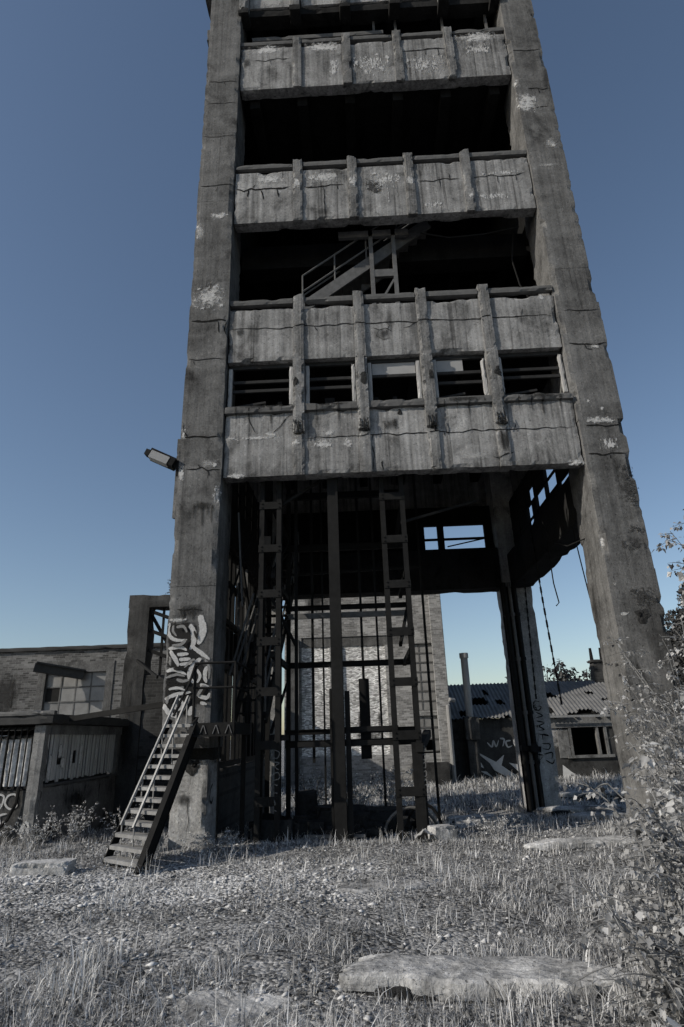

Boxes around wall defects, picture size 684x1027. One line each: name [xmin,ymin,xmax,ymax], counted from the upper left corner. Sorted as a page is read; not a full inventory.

spalling [513,80,536,111]
spalling [194,285,224,310]
crack [183,423,218,438]